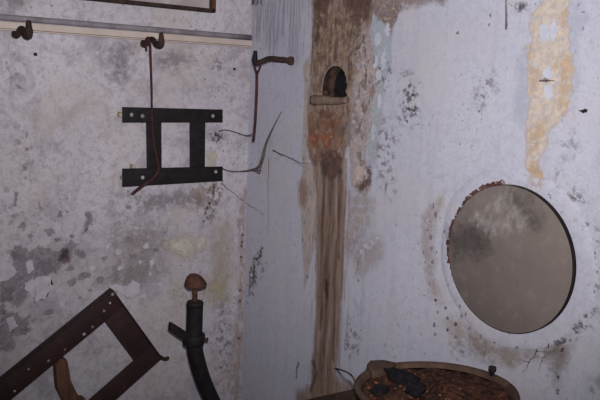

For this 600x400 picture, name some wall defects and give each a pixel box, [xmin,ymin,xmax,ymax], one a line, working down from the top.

leakage [300,0,373,282]
peeling [525,0,575,185]
peeling [0,212,97,351]
peeling [97,265,146,298]
leakage [249,247,264,295]